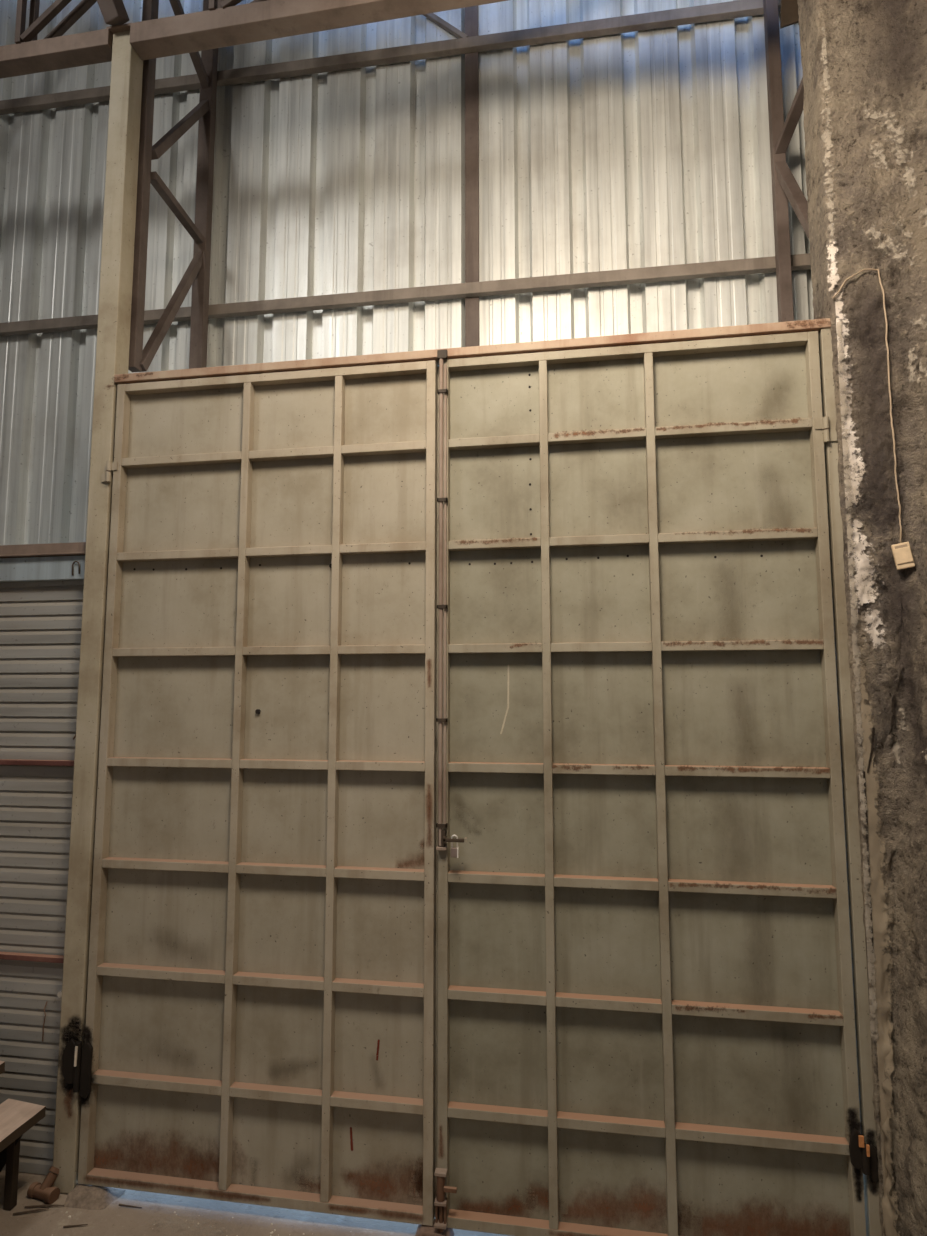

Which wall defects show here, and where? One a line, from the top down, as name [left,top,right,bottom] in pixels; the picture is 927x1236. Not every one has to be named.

damp [820,27,905,1040]
corrosion [86,1139,268,1201]
corrosion [330,1162,436,1220]
corrosion [461,1187,549,1216]